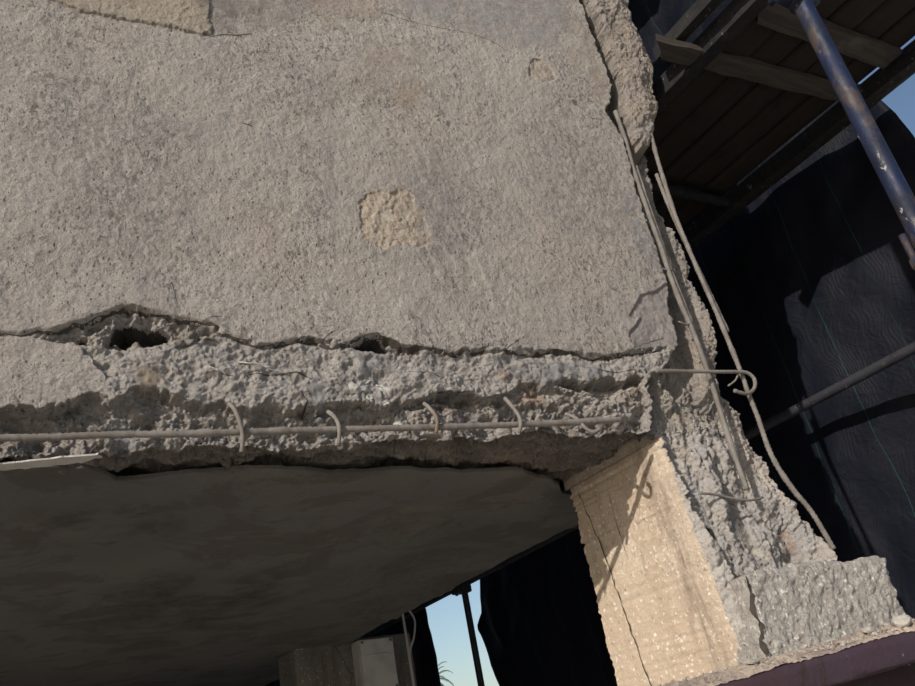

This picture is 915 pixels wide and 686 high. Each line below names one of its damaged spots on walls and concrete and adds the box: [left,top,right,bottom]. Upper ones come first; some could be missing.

crack [0,283,664,362]
spalling [0,155,837,645]